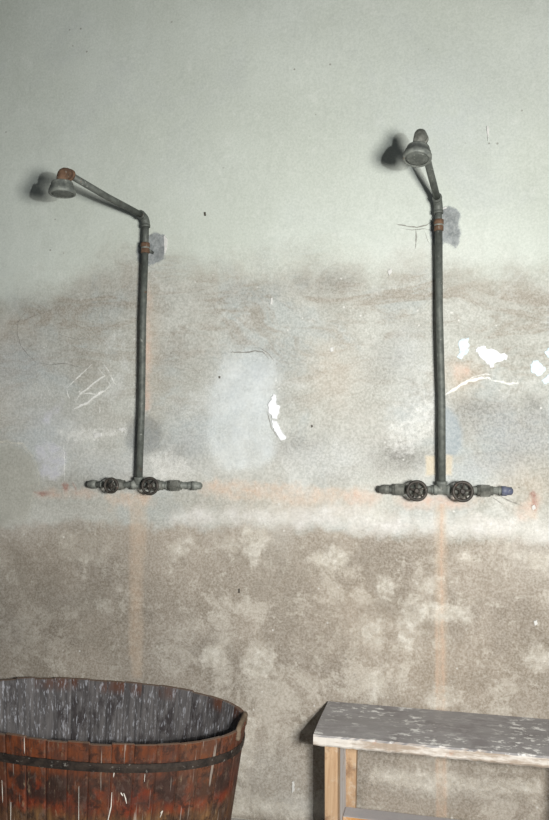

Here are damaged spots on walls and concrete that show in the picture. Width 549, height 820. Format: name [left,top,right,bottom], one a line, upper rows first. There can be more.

crack [448,374,511,393]
peeling [457,338,508,368]
peeling [530,348,549,385]
peeling [268,393,287,440]